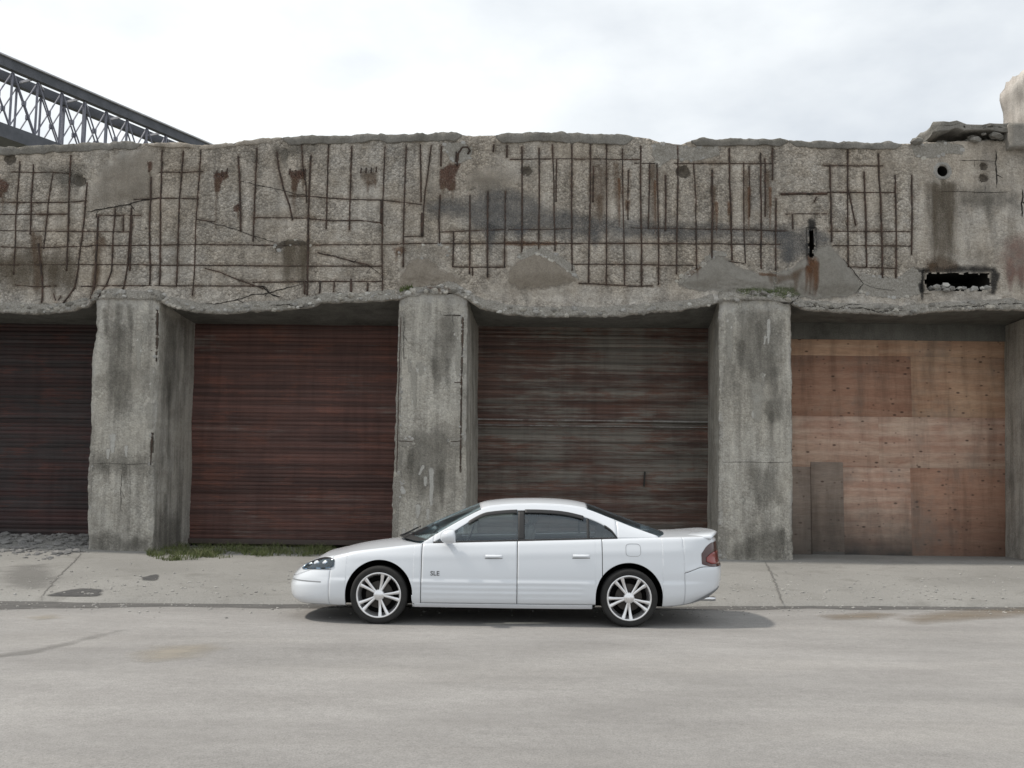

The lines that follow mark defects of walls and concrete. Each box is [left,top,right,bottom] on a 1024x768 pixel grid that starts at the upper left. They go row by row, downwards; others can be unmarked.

rust [214,172,228,192]
rust [290,171,304,199]
rust [440,163,460,190]
leakage [919,179,1024,298]
crack [199,284,315,308]
spalling [0,141,1024,538]